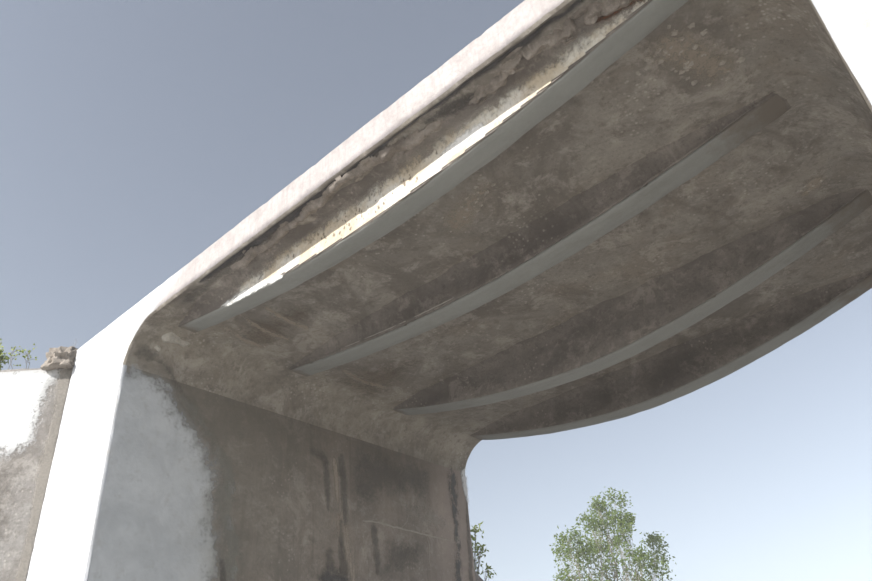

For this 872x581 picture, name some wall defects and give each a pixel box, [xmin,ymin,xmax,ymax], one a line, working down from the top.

spalling [468,0,633,105]
spalling [230,119,444,270]
damp [449,468,473,581]